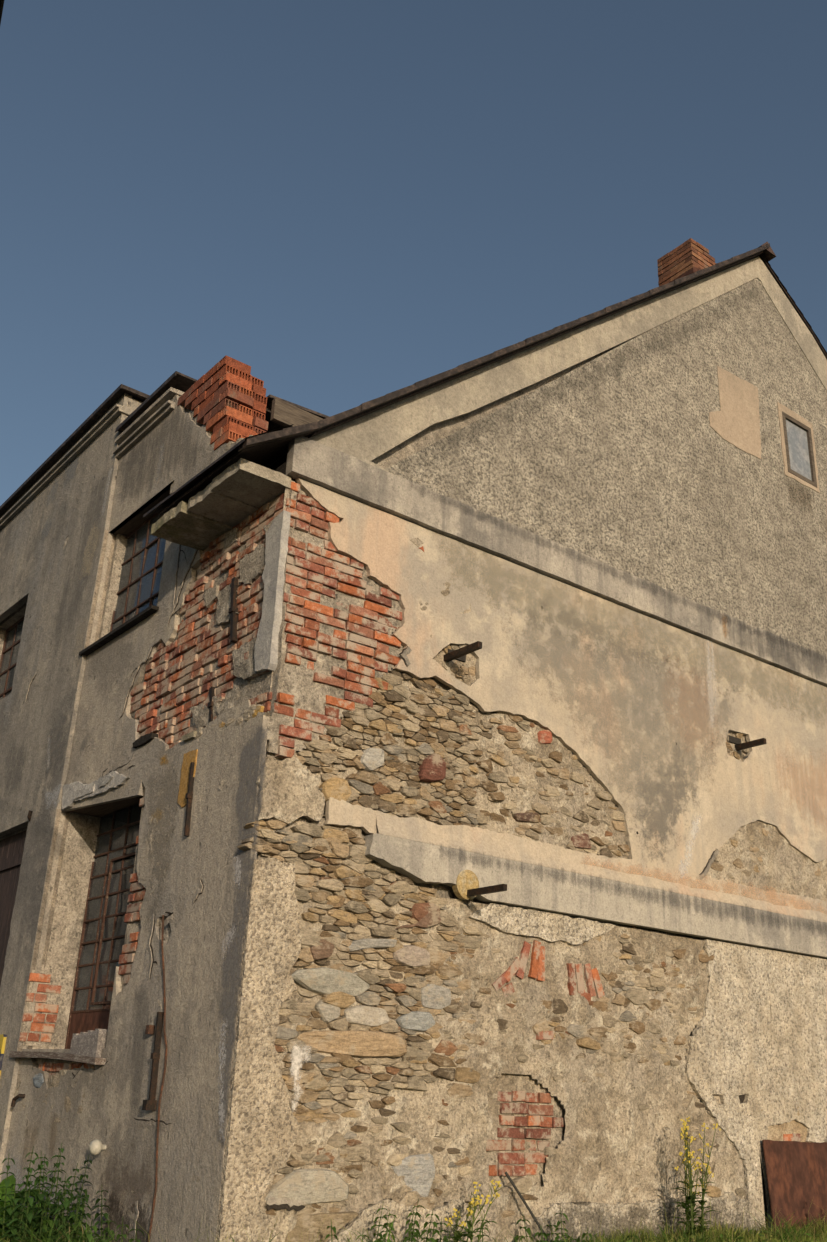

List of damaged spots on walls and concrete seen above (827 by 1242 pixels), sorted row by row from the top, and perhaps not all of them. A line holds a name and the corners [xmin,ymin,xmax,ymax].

spalling [726,731,750,761]
flaking render [62,771,129,809]
spalling [130,480,746,1242]
spalling [706,821,827,902]
spalling [118,836,146,991]
spalling [14,964,95,1108]
spalling [762,1106,811,1145]